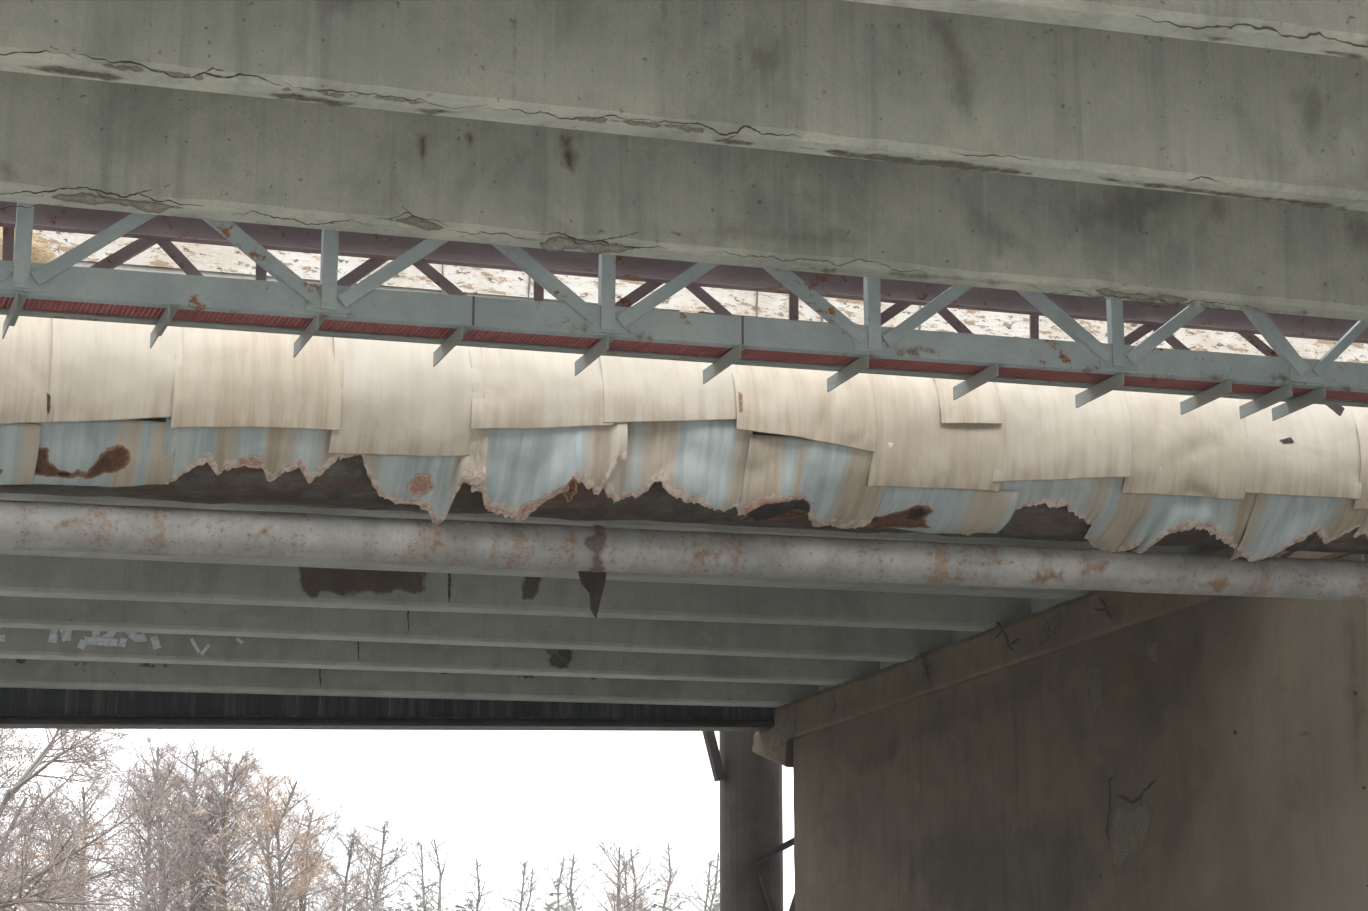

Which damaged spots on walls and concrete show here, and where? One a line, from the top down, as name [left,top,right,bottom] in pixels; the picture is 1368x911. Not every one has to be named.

crack [1136,15,1368,47]
crack [0,50,802,142]
crack [0,187,200,210]
crack [233,206,662,248]
crack [718,251,949,278]
corrosion [34,445,130,479]
corrosion [741,494,814,515]
corrosion [864,505,933,529]
corrosion [299,567,425,598]